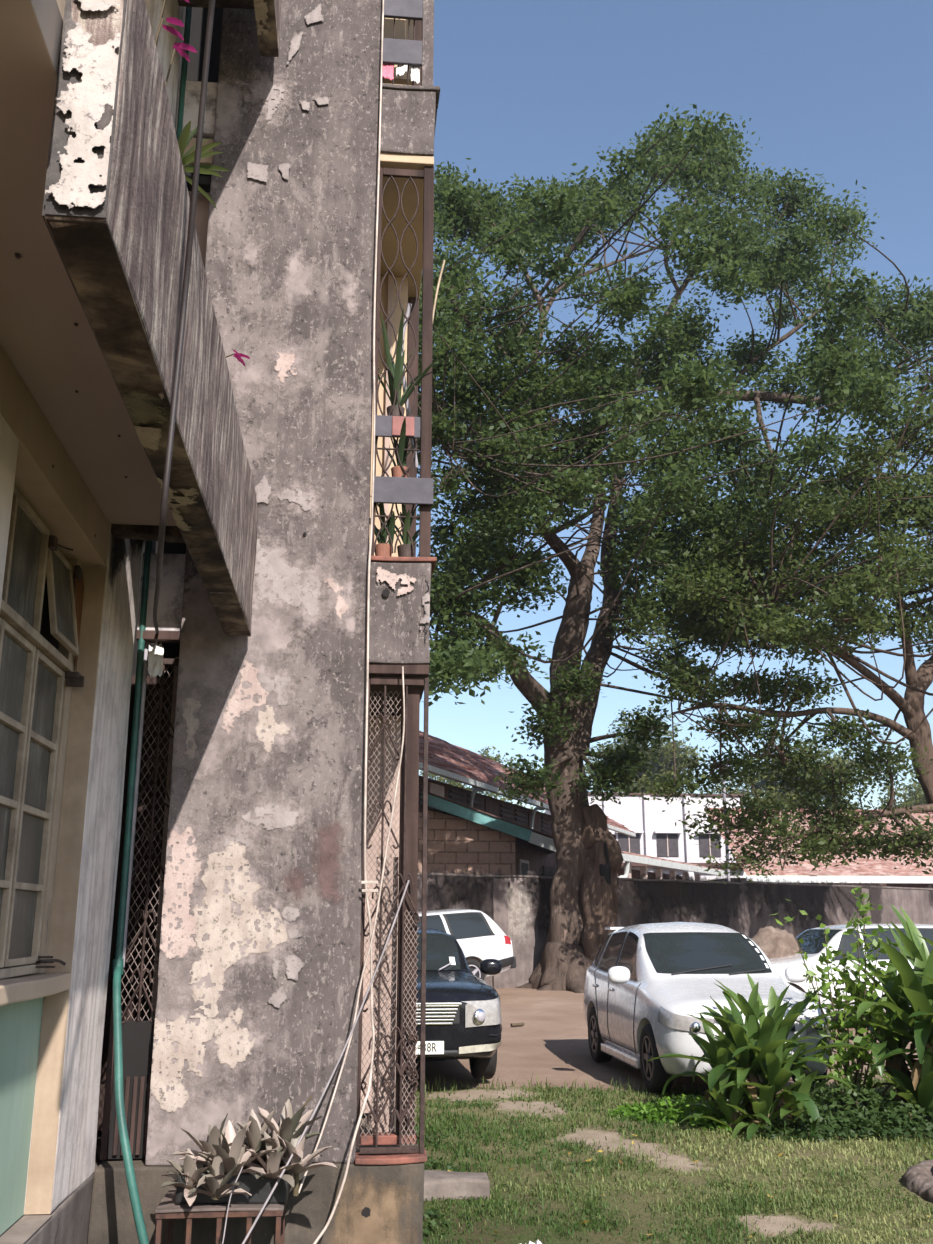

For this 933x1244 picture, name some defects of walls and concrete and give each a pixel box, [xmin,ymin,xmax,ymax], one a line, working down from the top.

peeling [45,0,121,209]
leakage [119,390,168,427]